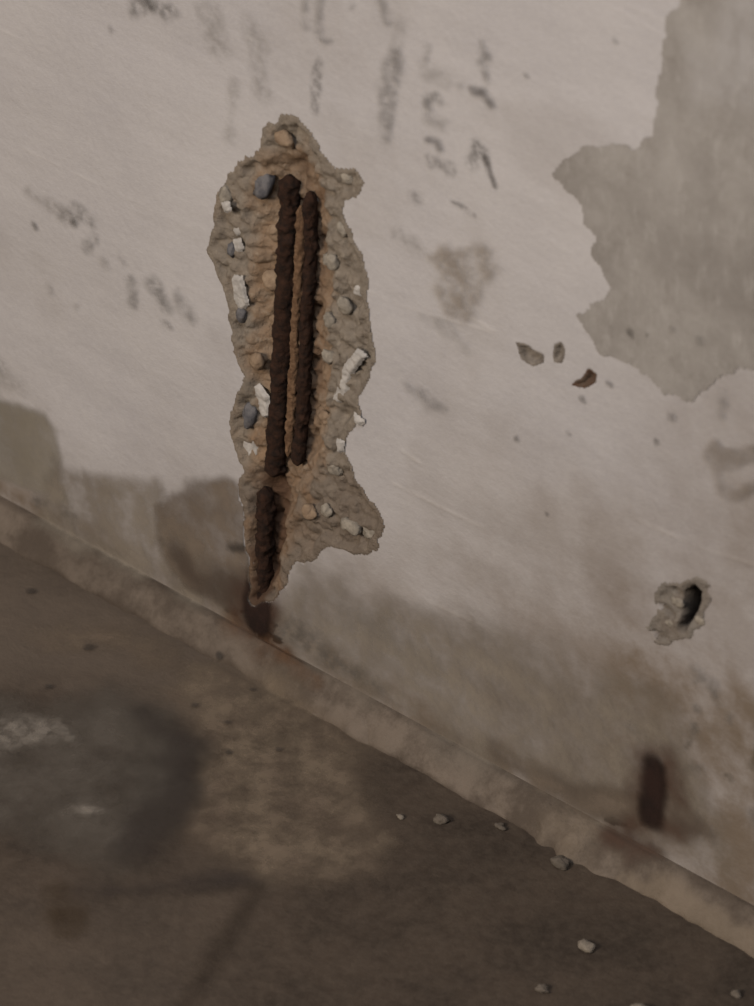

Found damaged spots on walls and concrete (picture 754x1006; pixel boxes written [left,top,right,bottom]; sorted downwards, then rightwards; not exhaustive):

spalling [206,113,385,606]
flaking render [552,0,754,402]
spalling [645,576,713,646]